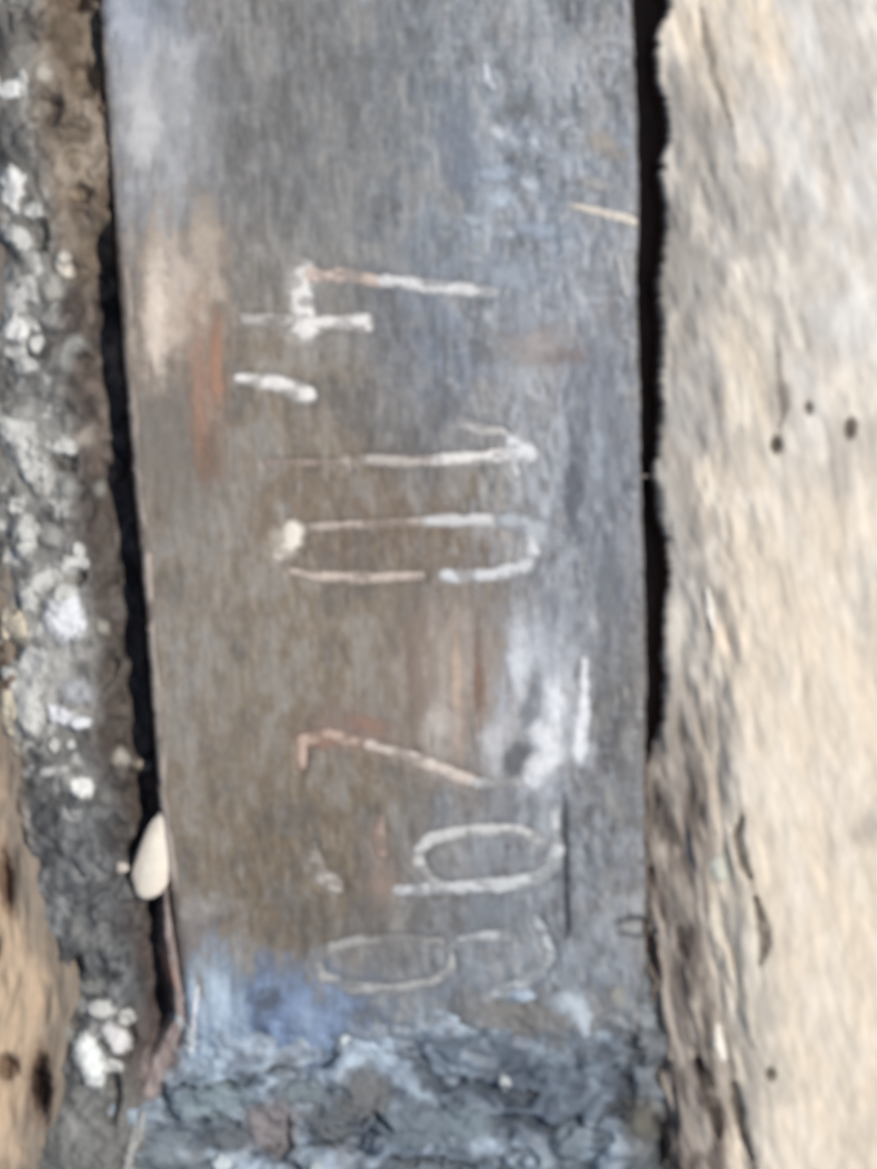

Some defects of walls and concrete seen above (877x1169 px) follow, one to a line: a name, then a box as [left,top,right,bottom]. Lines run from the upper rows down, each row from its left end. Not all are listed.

leakage [0,64,52,100]
leakage [0,164,43,296]
leakage [42,251,74,300]
leakage [0,314,44,353]
leakage [59,336,87,371]
leakage [0,414,97,497]
leakage [95,482,106,496]
leakage [0,496,124,753]
leakage [114,748,153,770]
leakage [60,773,113,804]